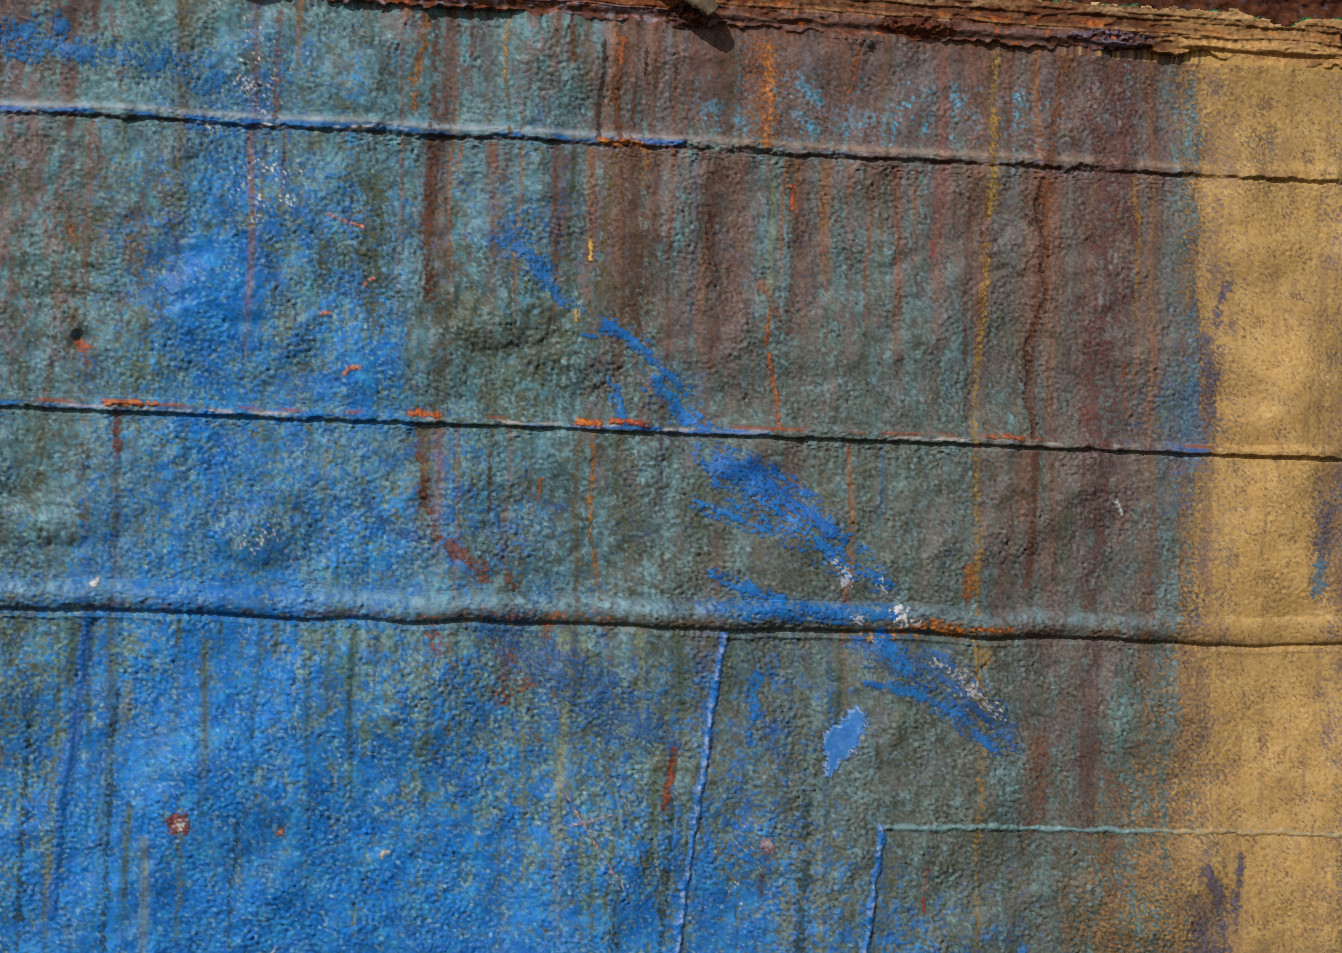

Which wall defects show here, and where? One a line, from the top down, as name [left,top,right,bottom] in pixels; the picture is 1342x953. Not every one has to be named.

rust [503,19,512,137]
rust [567,24,579,62]
rust [665,0,714,30]
rust [731,33,793,156]
rust [874,15,955,39]
rust [408,14,440,301]
rust [595,24,660,338]
rust [101,398,159,455]
rust [764,309,782,429]
rust [1042,27,1158,611]
rust [408,407,519,591]
rust [167,814,190,941]